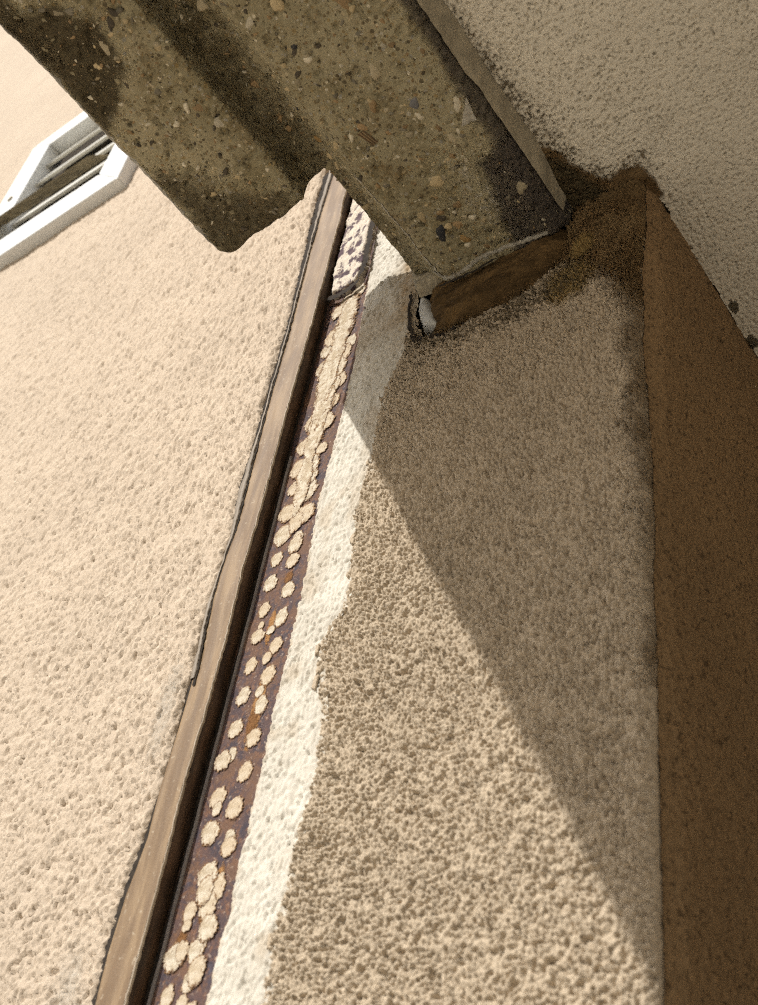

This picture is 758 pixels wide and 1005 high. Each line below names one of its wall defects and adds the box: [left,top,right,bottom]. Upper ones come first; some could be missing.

water stain [401,0,663,363]
rust [244,683,266,751]
peeling [205,199,568,1005]